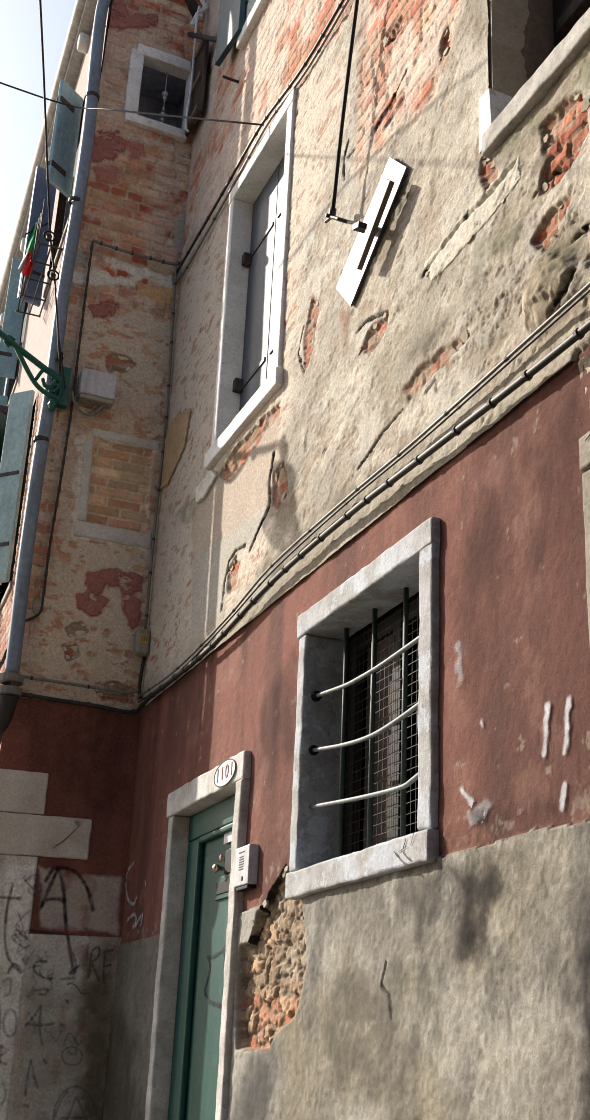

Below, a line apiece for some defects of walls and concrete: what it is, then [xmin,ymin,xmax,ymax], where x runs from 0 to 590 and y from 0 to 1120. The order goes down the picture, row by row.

spalling [383,15,405,47]
spalling [439,26,450,61]
flaking render [490,0,530,97]
spalling [539,93,590,196]
spalling [532,196,570,250]
spalling [302,296,319,373]
crack [358,311,389,332]
crack [221,451,275,610]
damp [457,875,498,959]
spalling [239,866,307,1050]
crack [381,971,393,1019]